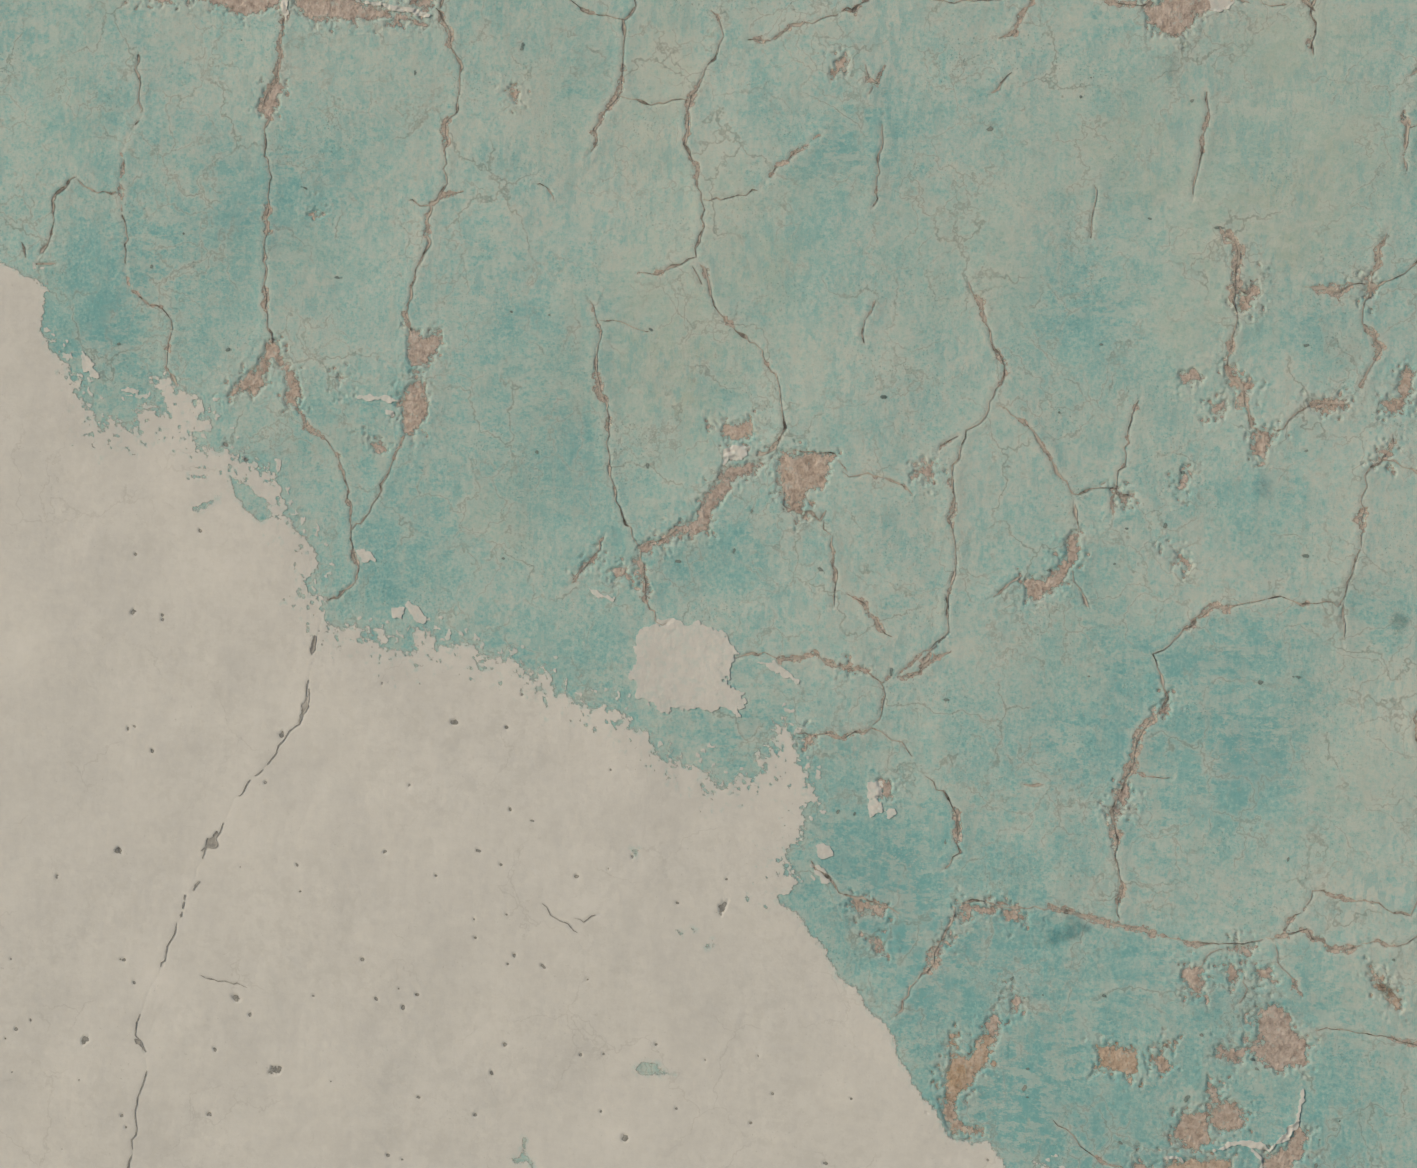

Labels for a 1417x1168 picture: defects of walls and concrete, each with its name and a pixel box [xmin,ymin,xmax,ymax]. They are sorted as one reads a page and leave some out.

peeling [125,0,435,33]
peeling [391,325,444,437]
crack [401,0,464,334]
crack [570,0,912,494]
crack [1219,226,1417,432]
peeling [581,410,842,593]
crack [736,282,1139,869]
crack [160,635,316,967]
crack [895,438,1417,1016]
peeling [927,982,1026,1140]
peeling [1094,1036,1183,1087]
peeling [1133,1003,1319,1168]